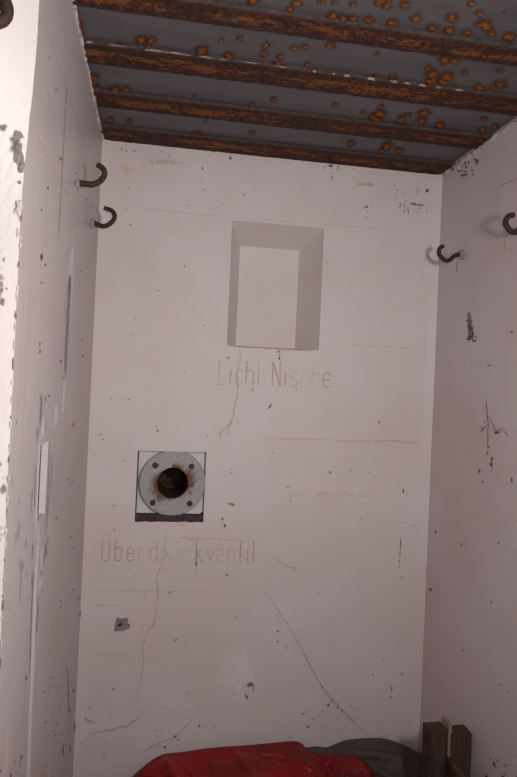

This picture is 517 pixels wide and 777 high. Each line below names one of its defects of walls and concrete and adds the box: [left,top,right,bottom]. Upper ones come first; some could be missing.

rust [317,1,376,24]
rust [374,0,516,43]
rust [91,74,131,93]
rust [424,56,468,88]